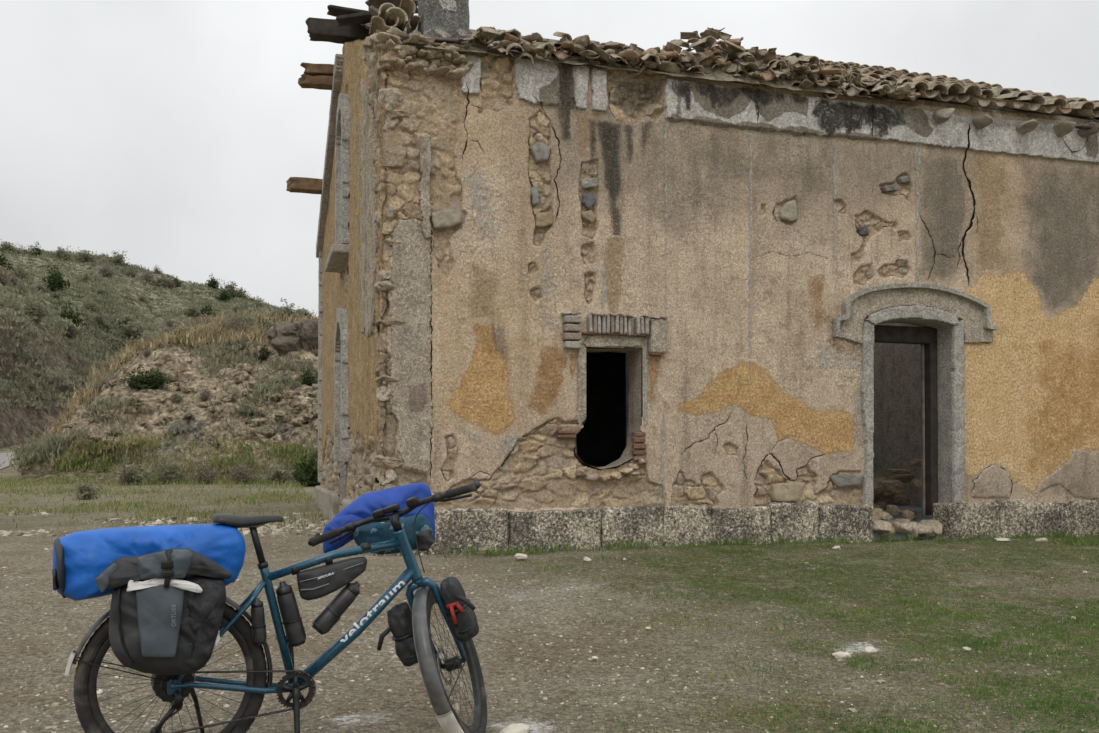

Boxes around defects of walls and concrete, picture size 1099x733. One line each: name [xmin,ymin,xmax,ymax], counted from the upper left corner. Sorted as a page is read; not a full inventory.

flaking render [343,0,467,500]
crack [462,84,484,158]
crack [535,97,562,222]
leakage [559,63,647,311]
leakage [672,82,905,223]
crack [919,123,978,283]
flaking render [434,324,723,511]
crack [682,414,828,480]
peeling [677,361,857,456]
peeling [964,269,1099,492]